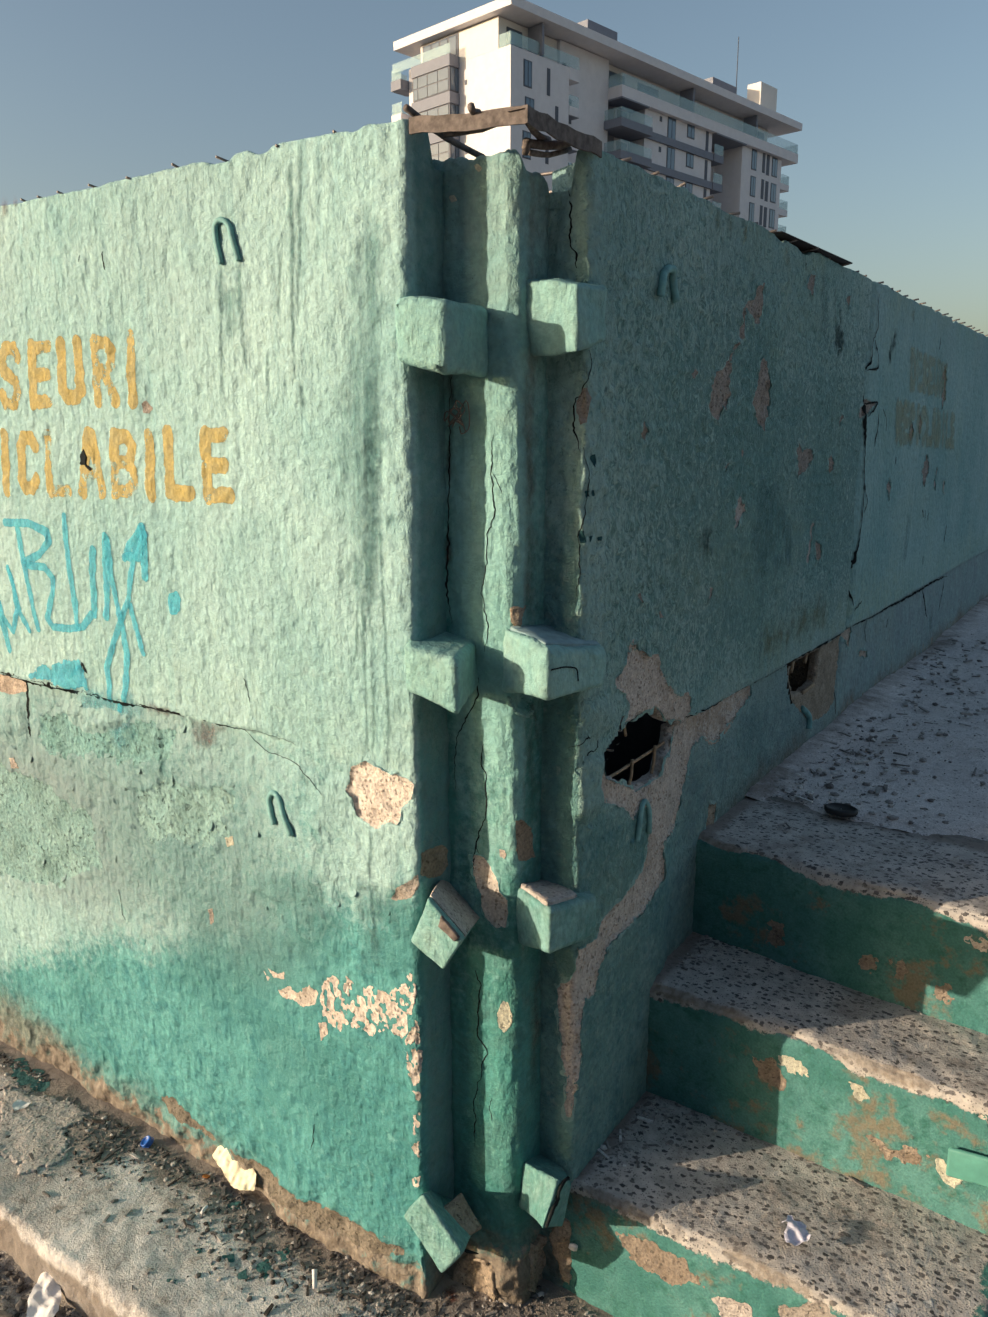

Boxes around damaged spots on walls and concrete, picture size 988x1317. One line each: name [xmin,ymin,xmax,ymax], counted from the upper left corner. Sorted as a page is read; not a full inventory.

crack [444,377,452,620]
crack [686,300,947,717]
crack [1,662,321,794]
spalling [344,758,414,834]
spalling [368,819,536,937]
crack [454,441,502,870]
spalling [521,880,577,906]
spalling [554,640,754,1123]
peeling [264,969,423,1158]
crack [473,970,492,1137]
peeling [752,1055,809,1091]
peeling [615,1231,752,1317]